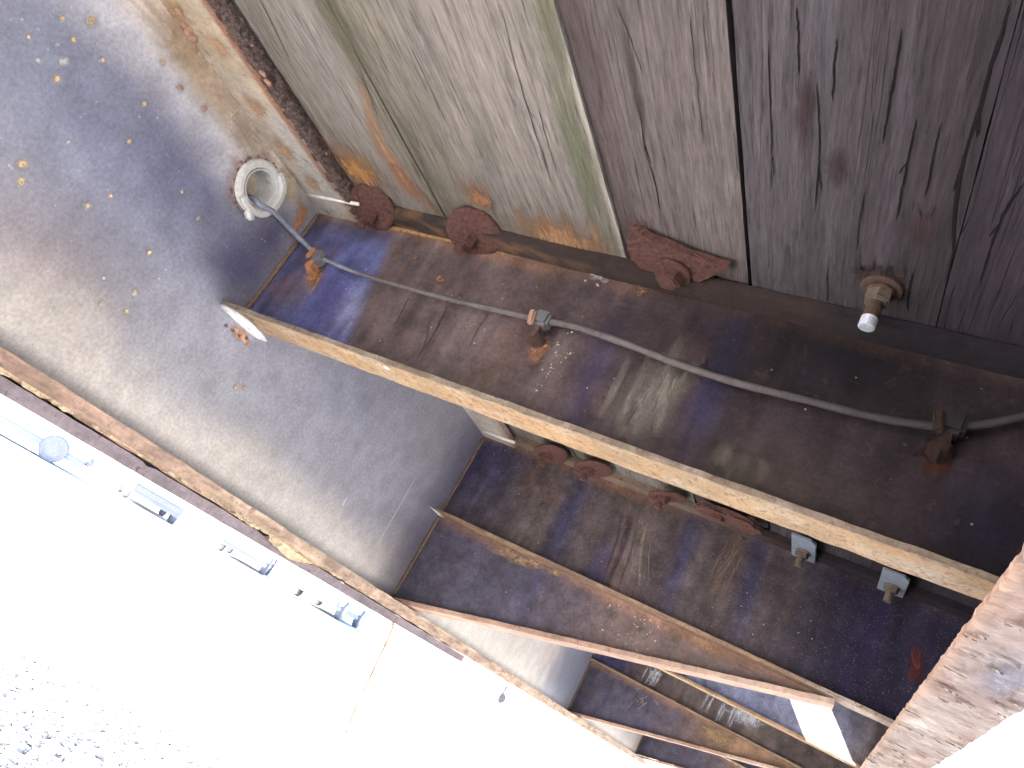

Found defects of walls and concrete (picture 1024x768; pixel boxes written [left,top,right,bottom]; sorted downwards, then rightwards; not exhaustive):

corrosion [164,0,377,231]
crack [634,97,661,215]
crack [690,18,704,142]
crack [767,44,775,188]
crack [796,6,837,212]
crack [882,29,902,144]
crack [896,5,1010,280]
crack [980,182,1024,287]